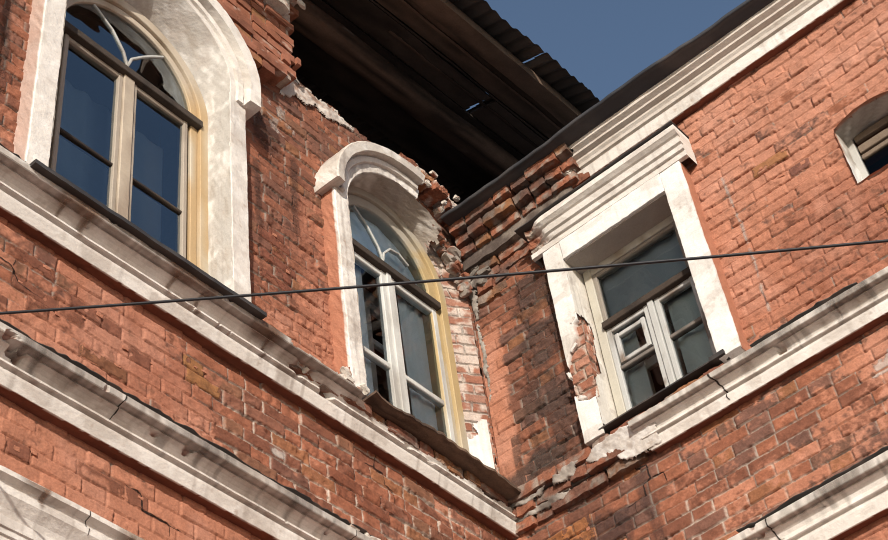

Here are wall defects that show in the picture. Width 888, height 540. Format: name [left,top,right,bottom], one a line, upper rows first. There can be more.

spalling [280,77,354,132]
flaking render [425,224,498,473]
flaking render [566,314,600,401]
crack [707,374,730,400]
flaking render [289,361,724,540]
crack [126,485,179,536]